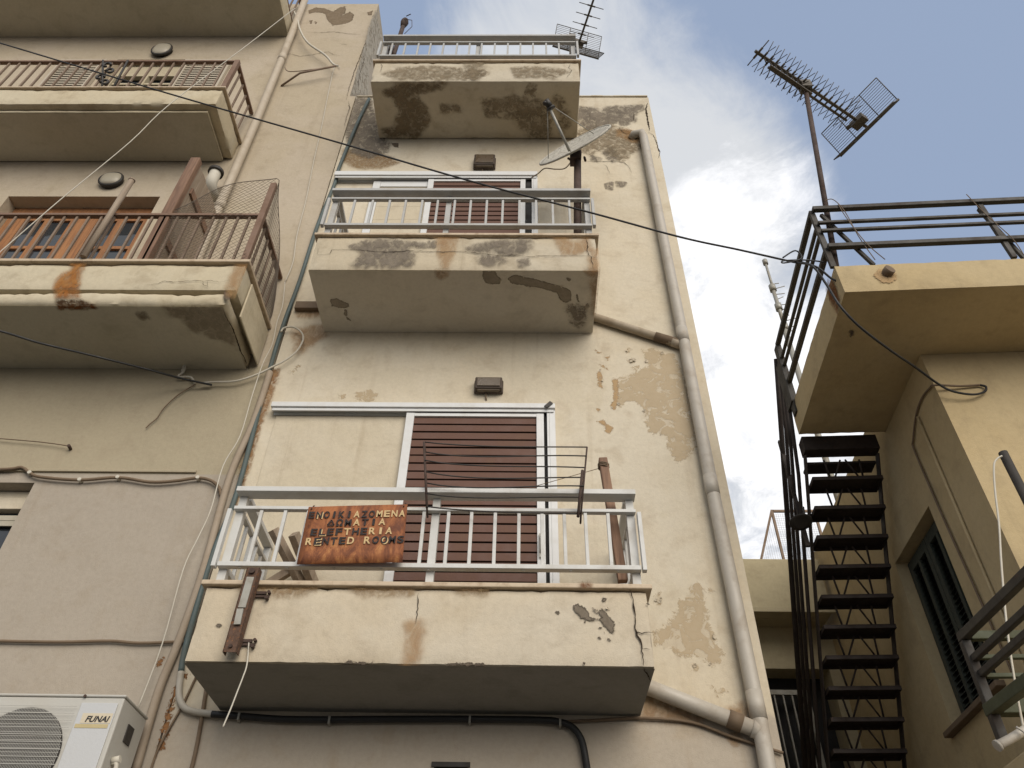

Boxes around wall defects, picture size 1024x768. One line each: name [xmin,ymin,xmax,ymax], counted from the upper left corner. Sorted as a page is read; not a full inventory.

water stain [344,62,485,169]
water stain [482,66,644,162]
rust [54,264,96,310]
water stain [349,238,436,268]
water stain [467,239,531,266]
flaking render [482,271,589,326]
flaking render [595,348,698,461]
flaking render [573,596,615,641]
crack [630,591,652,681]
flaking render [653,583,724,671]